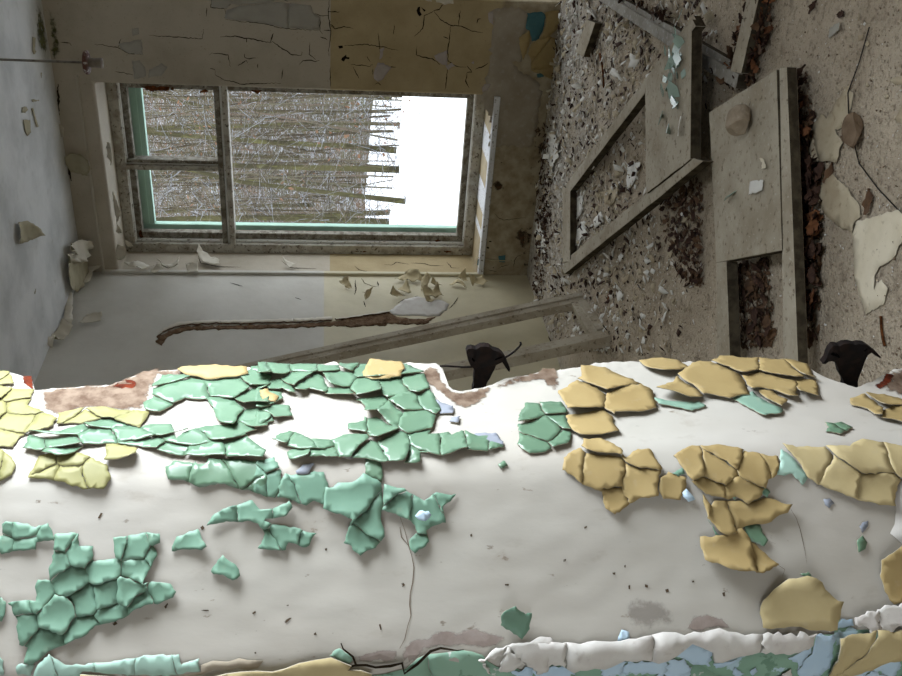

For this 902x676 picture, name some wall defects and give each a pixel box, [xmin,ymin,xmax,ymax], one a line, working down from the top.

peeling [22,99,39,136]
crack [154,0,488,89]
flaking render [481,6,559,148]
peeling [48,239,102,347]
peeling [124,245,220,273]
peeling [156,259,488,337]
peeling [0,355,902,676]